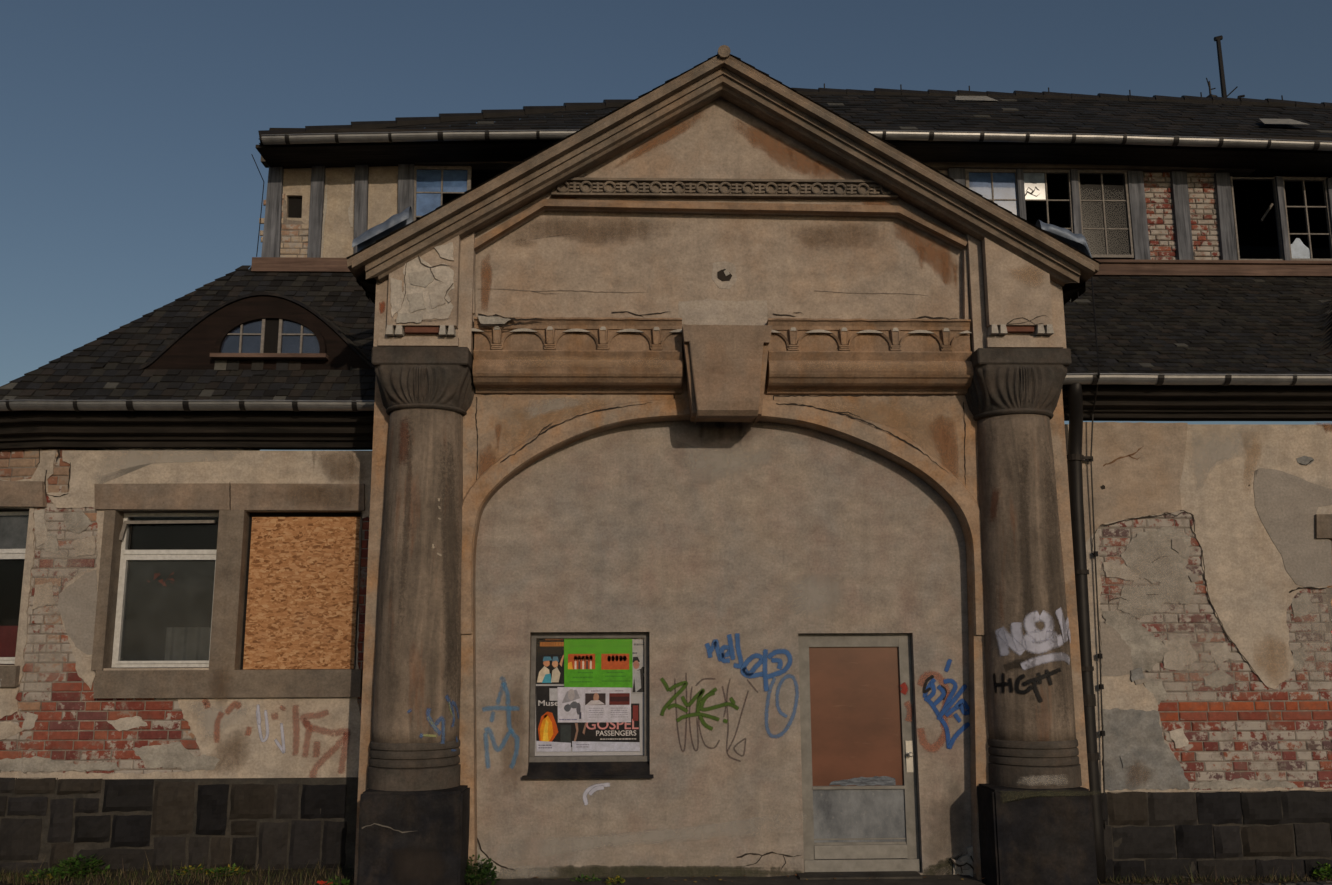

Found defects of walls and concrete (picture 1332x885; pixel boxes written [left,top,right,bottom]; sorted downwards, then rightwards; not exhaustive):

peeling [390,242,454,324]
crack [773,395,966,486]
spalling [0,448,220,774]
spalling [1098,510,1332,790]
crack [737,852,801,869]